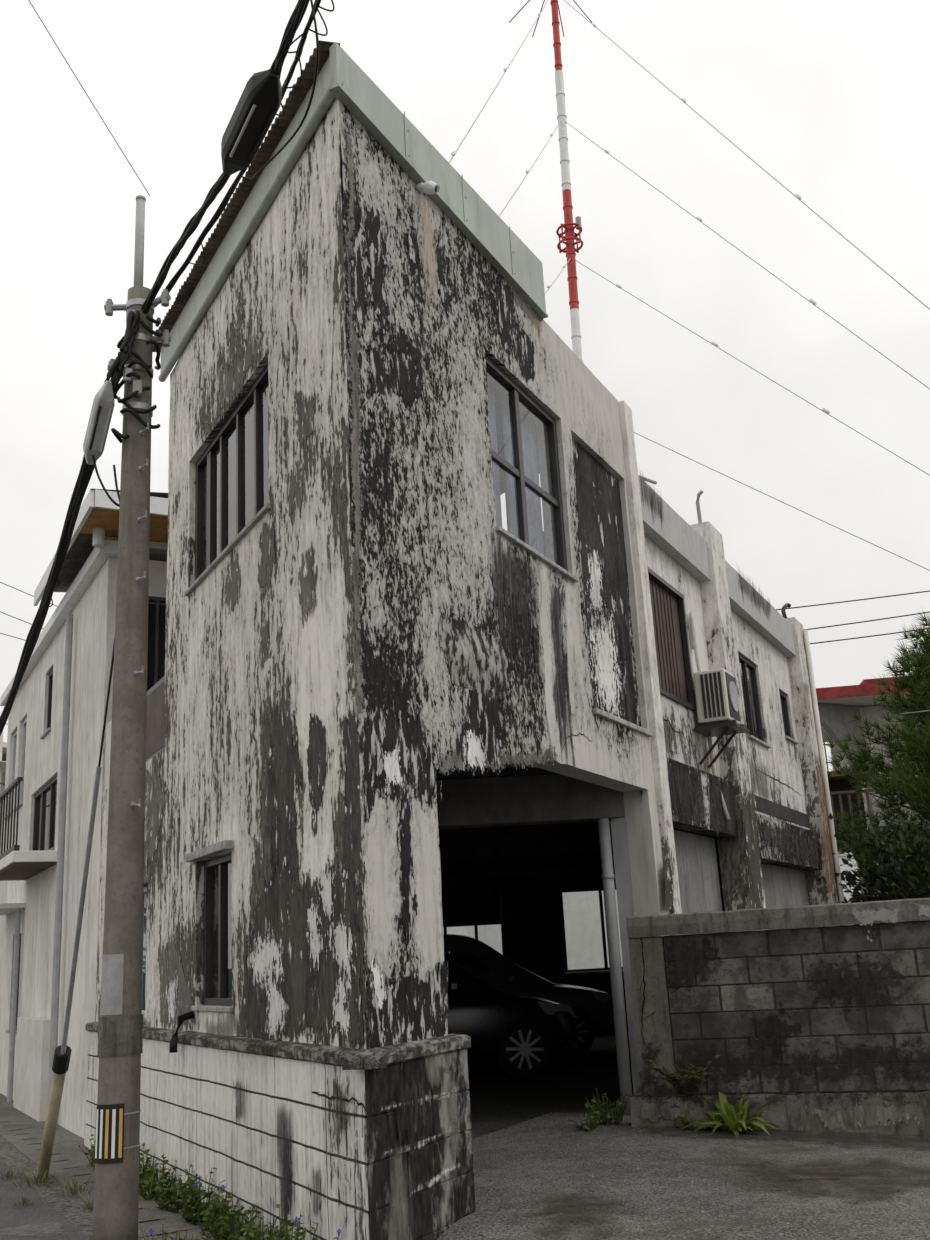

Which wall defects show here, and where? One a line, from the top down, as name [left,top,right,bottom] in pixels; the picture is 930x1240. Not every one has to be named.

water stain [420,200,437,310]
water stain [491,440,638,772]
water stain [667,759,739,840]
water stain [749,760,770,799]
water stain [757,819,822,870]
water stain [662,937,727,1000]
water stain [803,954,916,1015]
water stain [385,1059,459,1240]